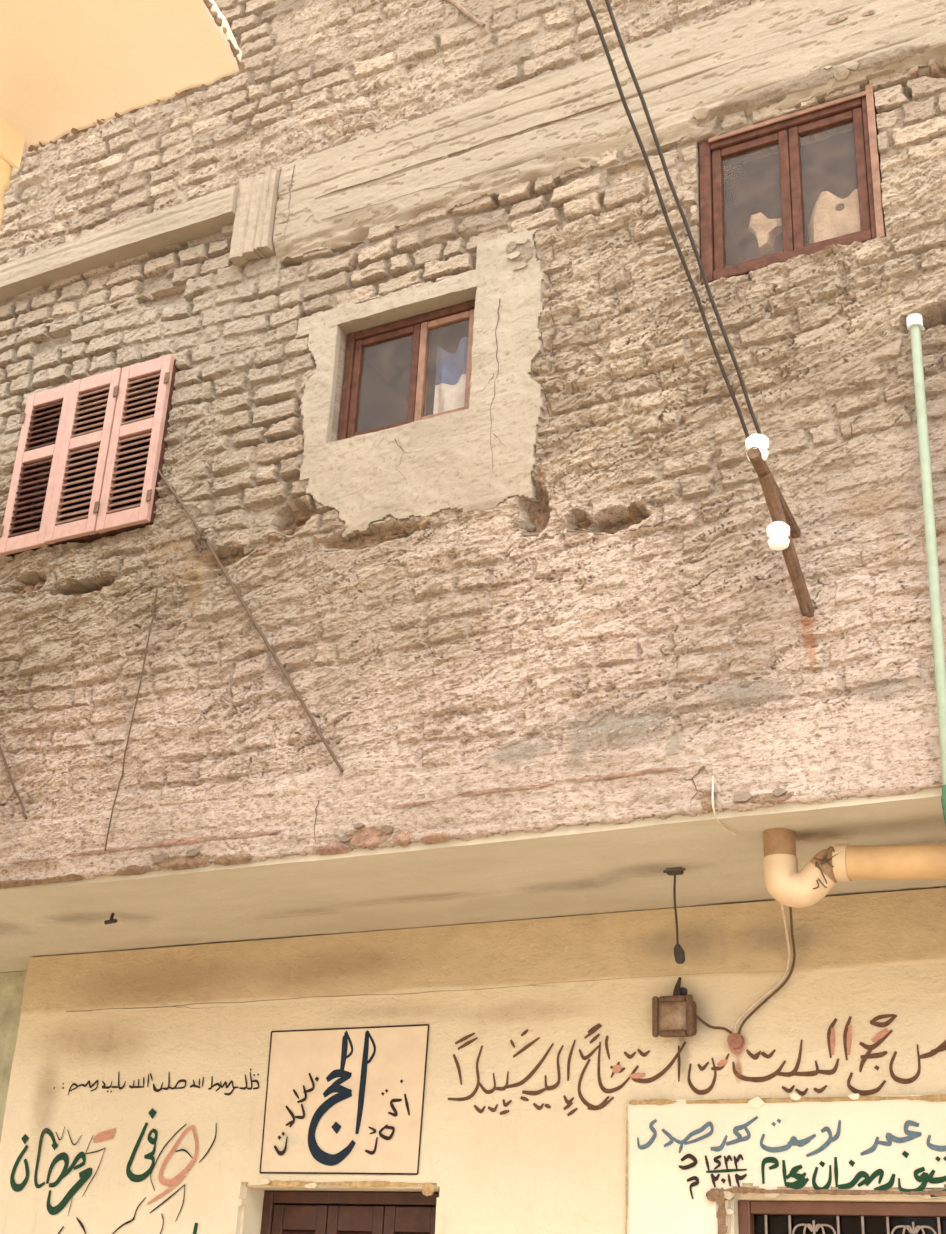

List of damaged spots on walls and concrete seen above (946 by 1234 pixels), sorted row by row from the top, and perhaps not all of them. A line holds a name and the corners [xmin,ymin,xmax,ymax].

crack [476,299,506,487]
spalling [325,516,431,552]